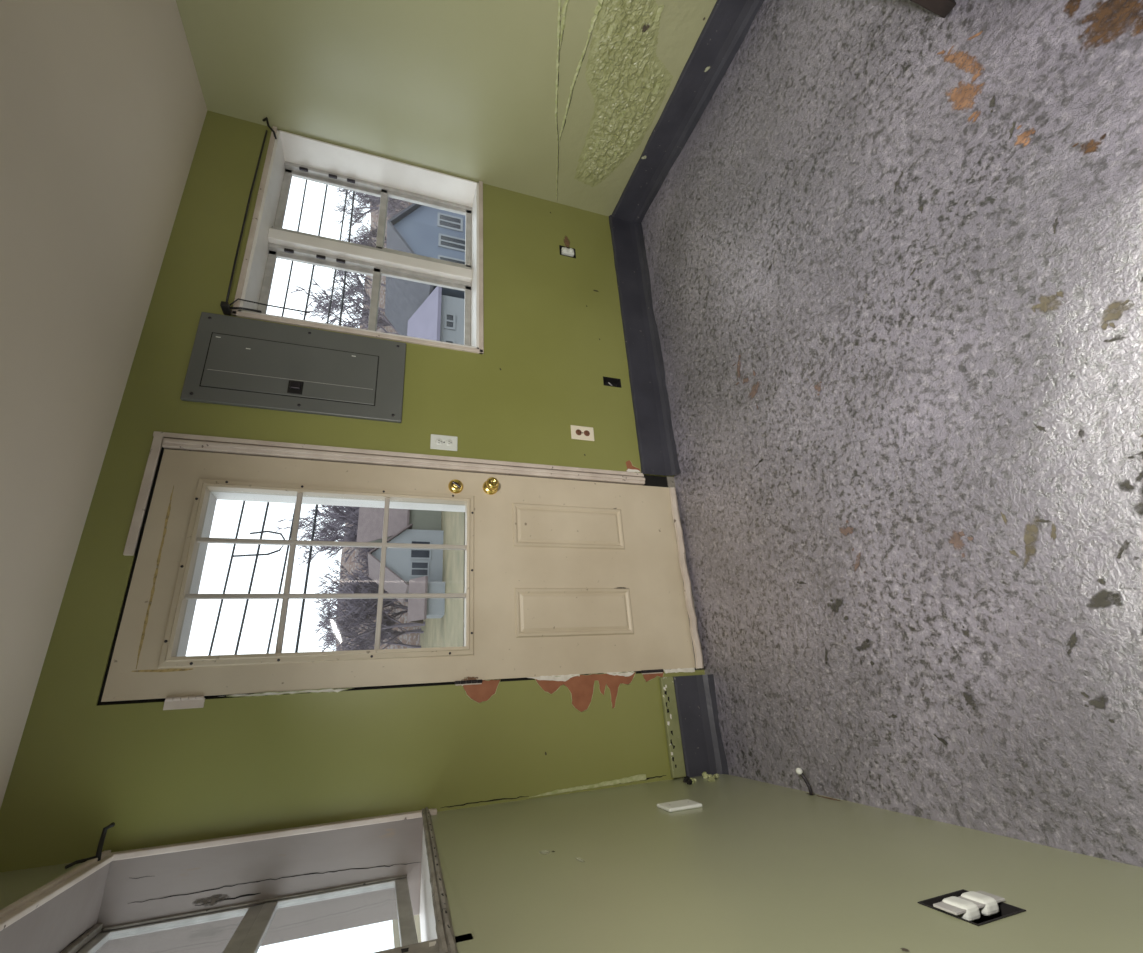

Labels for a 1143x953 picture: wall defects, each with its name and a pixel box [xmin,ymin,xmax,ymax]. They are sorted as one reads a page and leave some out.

crack [555,0,592,199]
peeling [462,679,501,704]
peeling [528,668,719,785]